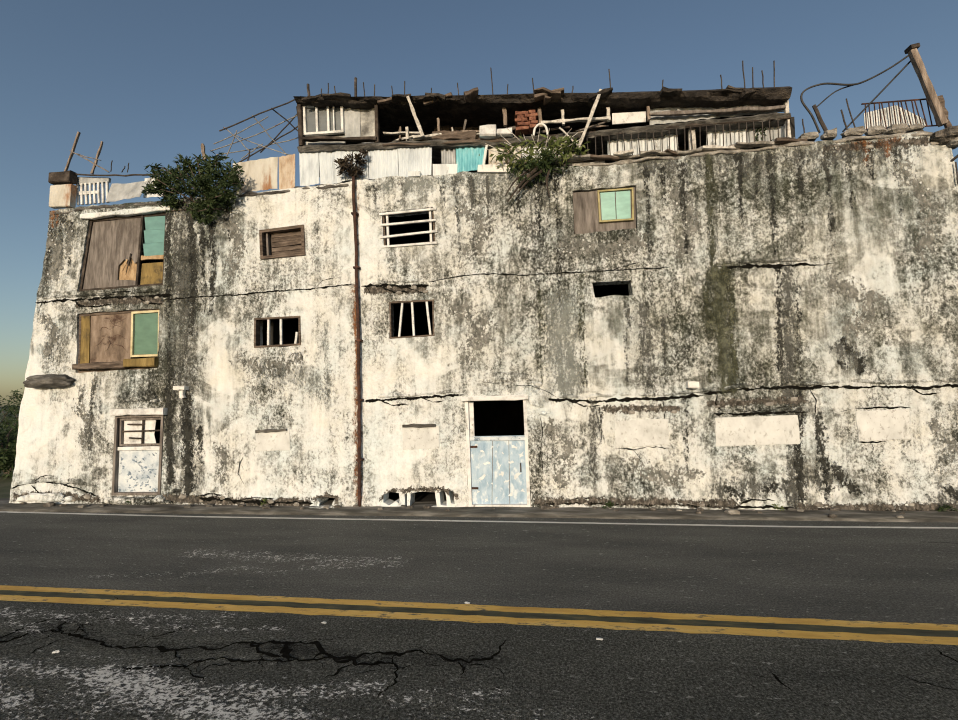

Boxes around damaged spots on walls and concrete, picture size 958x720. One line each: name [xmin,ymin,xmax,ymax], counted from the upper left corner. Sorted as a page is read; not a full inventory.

water stain [162,197,232,496]
crack [35,262,669,313]
water stain [373,169,605,484]
water stain [623,297,668,390]
water stain [638,140,920,510]
water stain [77,373,102,451]
corrosion [352,284,363,502]
crack [362,394,463,406]
crack [515,384,958,470]
crack [10,475,96,496]
crack [536,497,833,510]
mould [925,483,958,511]